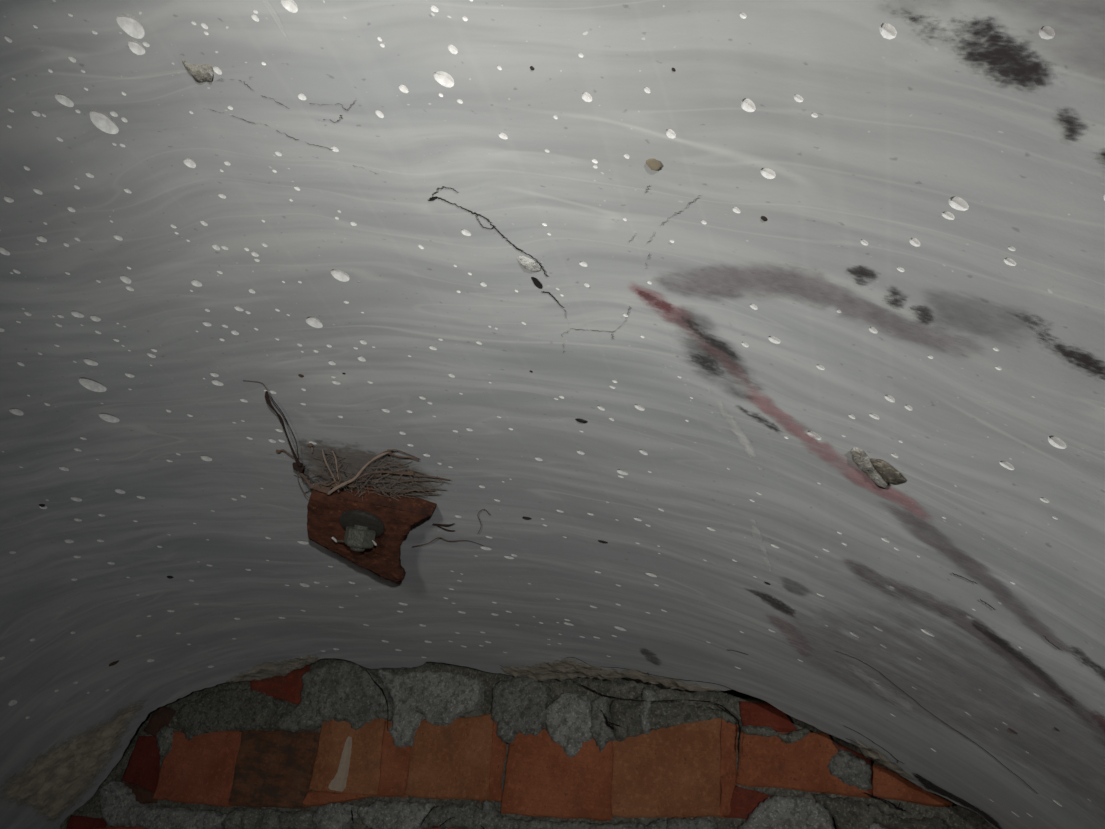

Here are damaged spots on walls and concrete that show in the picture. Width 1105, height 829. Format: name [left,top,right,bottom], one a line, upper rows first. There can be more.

crack [428,186,631,352]
damp [634,287,739,374]
damp [686,270,941,341]
damp [847,266,875,284]
damp [1028,320,1105,379]
damp [741,394,1105,679]
spalling [227,648,339,682]
damp [846,561,1105,739]
damp [912,773,1002,829]